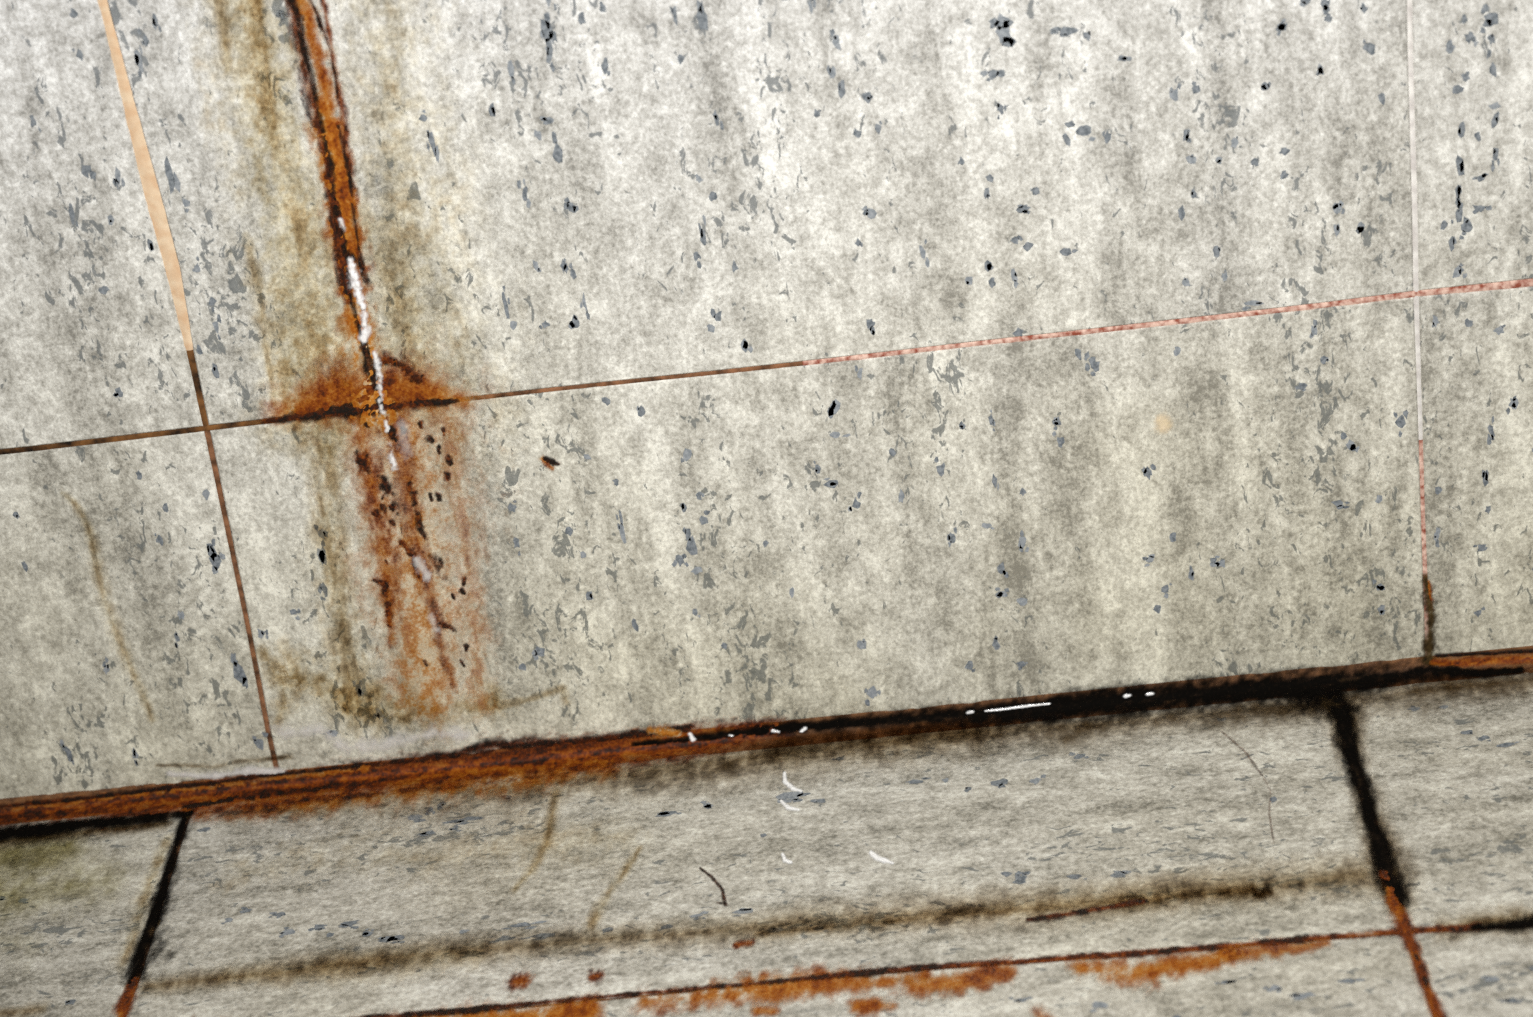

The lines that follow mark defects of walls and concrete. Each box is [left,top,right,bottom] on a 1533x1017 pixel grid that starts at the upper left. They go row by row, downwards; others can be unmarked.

crack [288,0,405,412]
rust [263,0,480,714]
rust [0,719,834,826]
damp [939,903,996,922]
damp [1026,879,1305,921]
damp [293,953,428,974]
damp [450,942,511,958]
damp [610,930,712,940]
damp [733,918,832,949]
rust [361,870,1481,1017]
rust [114,977,138,1017]